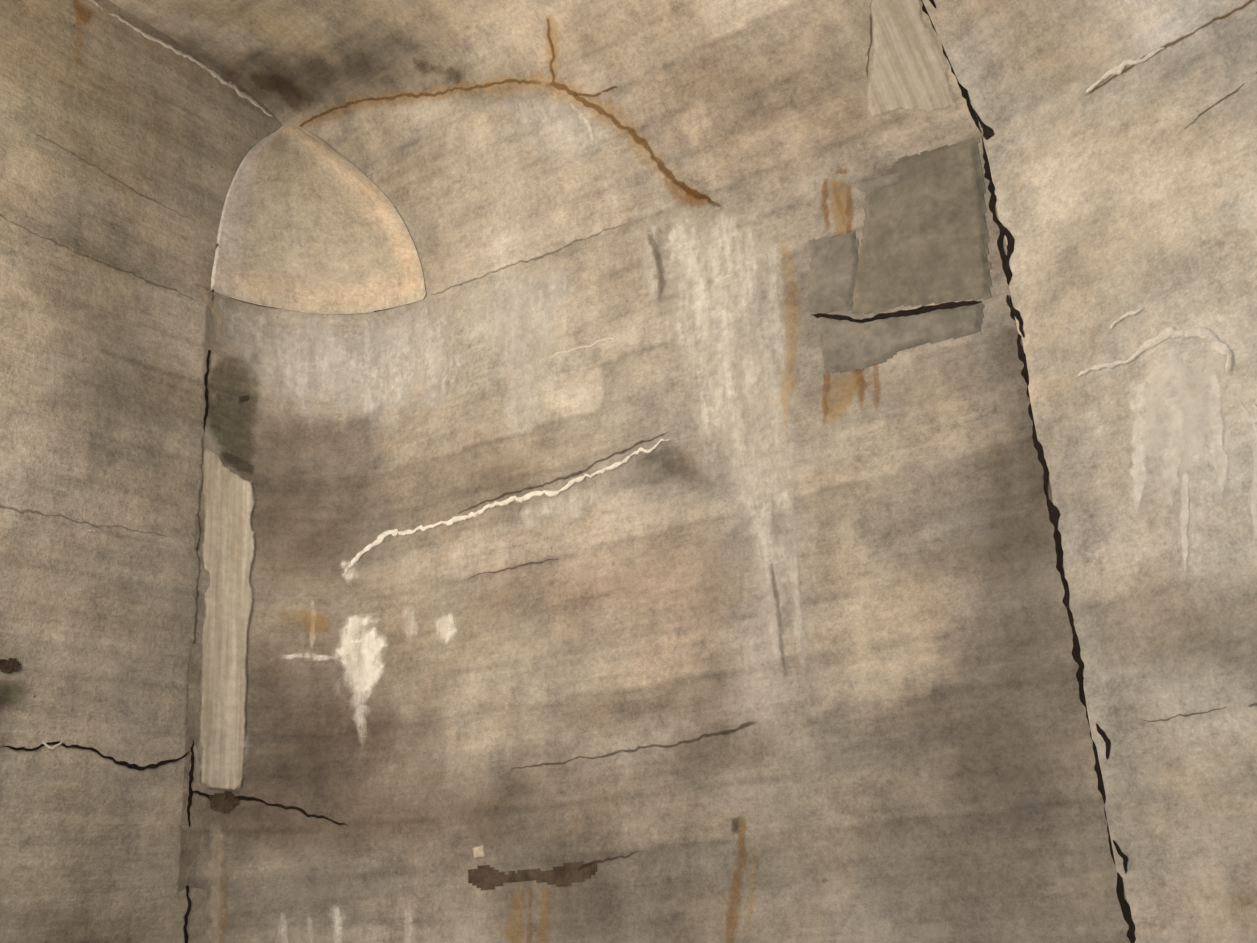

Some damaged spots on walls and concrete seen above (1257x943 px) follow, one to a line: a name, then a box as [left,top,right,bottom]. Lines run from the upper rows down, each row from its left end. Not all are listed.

water stain [90,0,273,117]
crack [1086,47,1164,93]
crack [203,350,211,432]
water stain [1078,327,1232,509]
crack [341,439,668,579]
crack [921,0,1136,943]
water stain [0,658,21,673]
water stain [285,616,385,726]
water stain [437,614,457,644]
crack [3,740,346,827]
spalling [468,846,597,890]
crack [183,885,191,943]